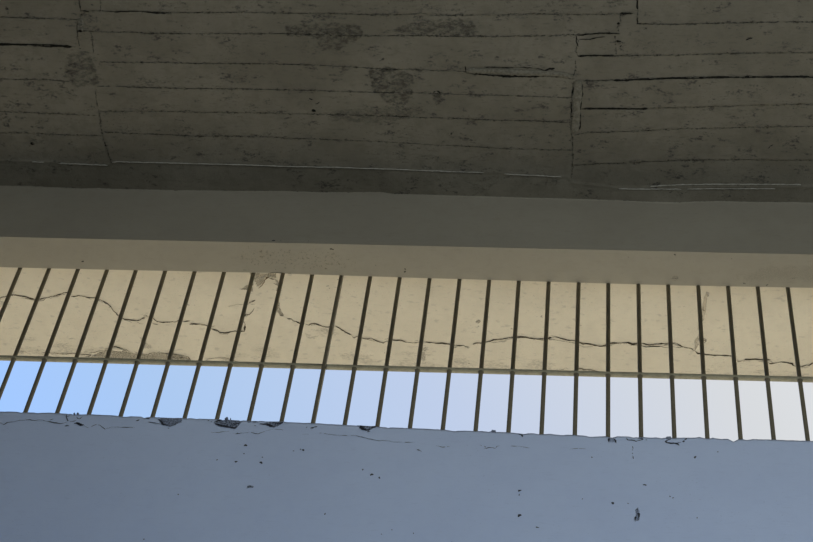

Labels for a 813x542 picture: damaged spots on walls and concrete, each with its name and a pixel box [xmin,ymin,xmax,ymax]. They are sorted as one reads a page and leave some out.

crack [1,292,255,335]
crack [288,318,813,367]